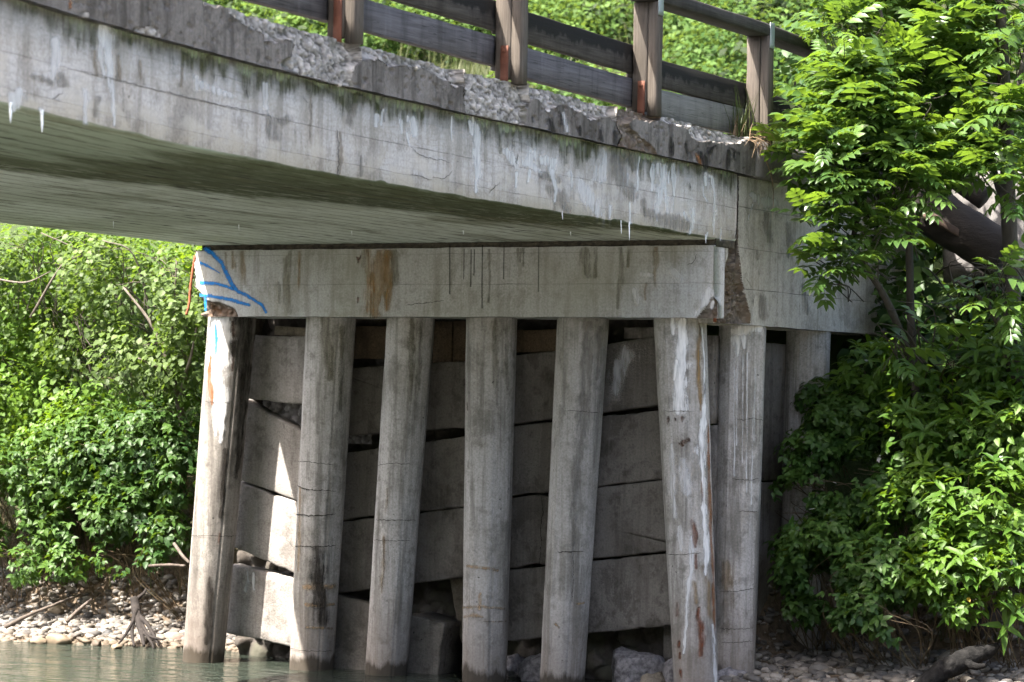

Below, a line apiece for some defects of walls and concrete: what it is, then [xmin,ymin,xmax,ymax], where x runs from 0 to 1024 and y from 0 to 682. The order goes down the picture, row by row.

damp [94,25,121,104]
spalling [202,0,749,154]
damp [595,130,693,234]
damp [670,138,740,201]
spalling [194,281,238,317]
corrosion [356,250,393,317]
spalling [697,196,751,324]
damp [731,299,765,417]
damp [207,317,255,519]
damp [671,318,710,654]
corrosion [693,427,732,657]
damp [204,577,214,645]